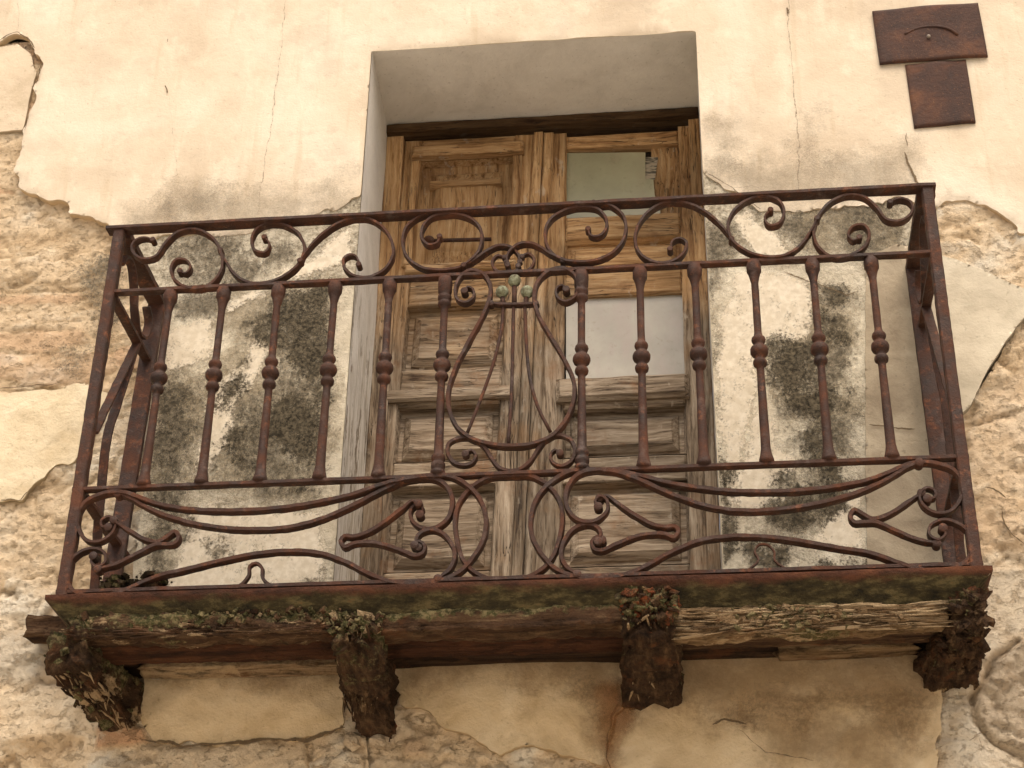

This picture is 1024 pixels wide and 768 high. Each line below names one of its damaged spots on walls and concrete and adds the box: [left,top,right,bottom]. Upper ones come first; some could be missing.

spalling [1,42,43,120]
water stain [140,233,337,574]
spalling [0,133,605,768]
water stain [706,213,737,309]
water stain [718,282,867,568]
water stain [772,203,905,256]
spalling [935,322,1024,768]
spalling [936,201,1024,288]